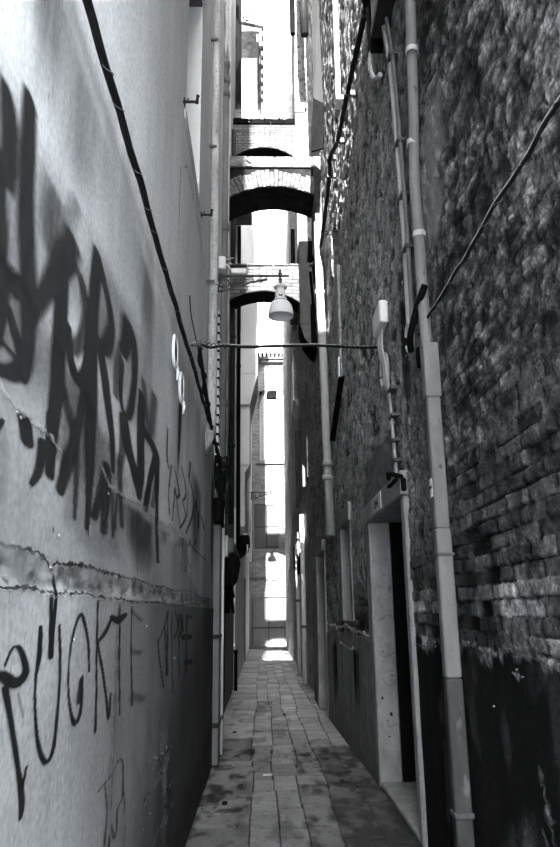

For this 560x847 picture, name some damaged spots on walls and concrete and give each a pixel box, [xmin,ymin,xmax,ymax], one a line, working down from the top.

crack [0,542,213,606]